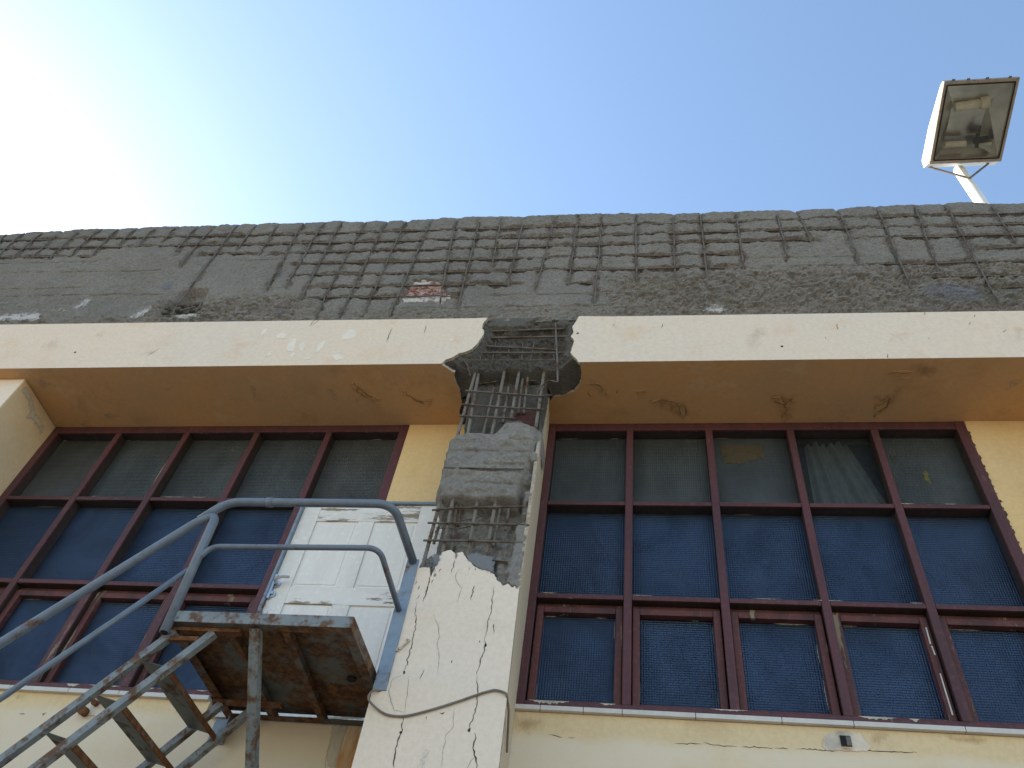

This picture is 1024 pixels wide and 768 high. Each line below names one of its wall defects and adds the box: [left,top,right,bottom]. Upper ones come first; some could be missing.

spalling [0,202,1024,589]
crack [388,608,440,766]
crack [442,588,494,768]